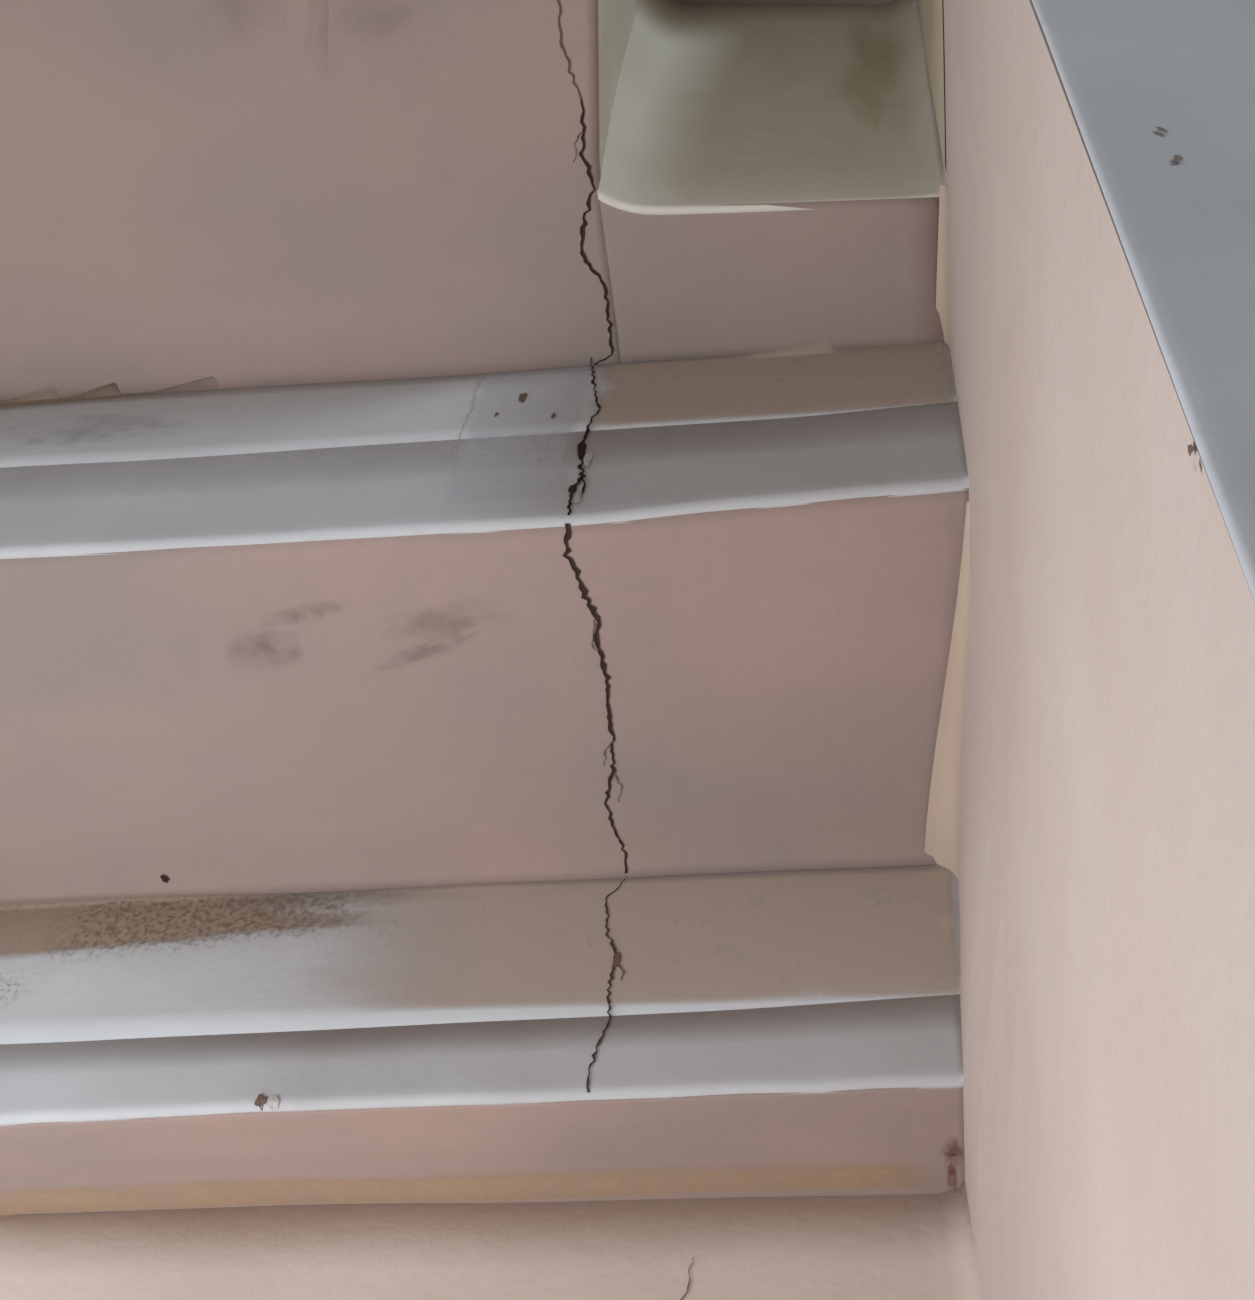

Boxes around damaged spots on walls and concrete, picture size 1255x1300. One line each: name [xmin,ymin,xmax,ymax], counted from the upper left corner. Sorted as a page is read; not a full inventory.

crack [557,0,627,1093]
crack [680,1258,693,1300]